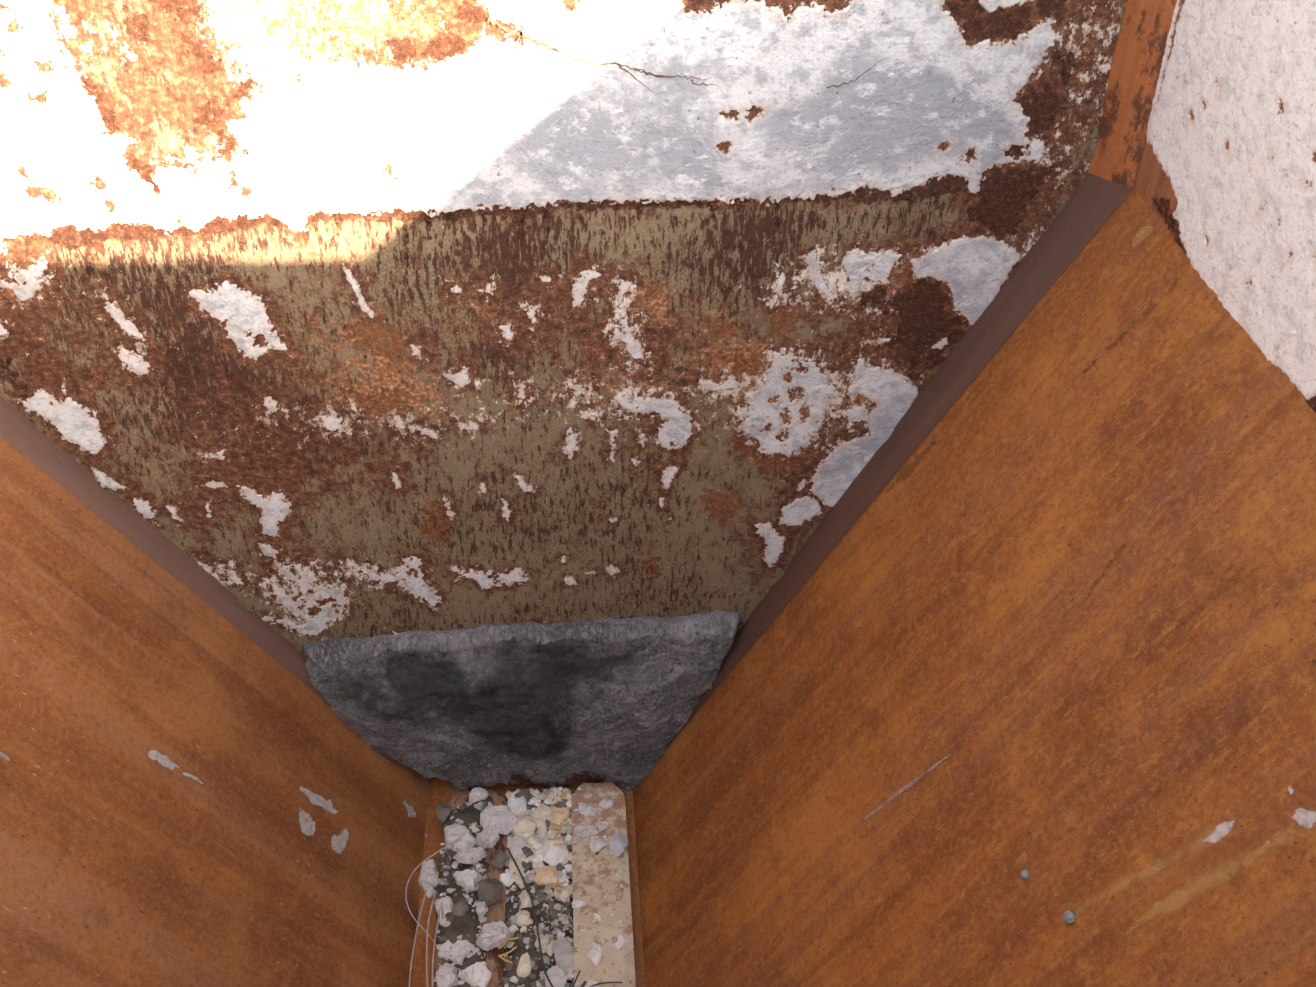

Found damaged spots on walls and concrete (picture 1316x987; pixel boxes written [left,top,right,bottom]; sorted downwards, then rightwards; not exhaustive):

peeling [0,0,1061,252]
corrosion [305,43,1079,267]
corrosion [0,359,37,399]
corrosion [23,213,283,278]
peeling [184,280,288,360]
corrosion [854,255,968,382]
peeling [804,235,1035,326]
corrosion [1153,198,1190,259]
peeling [17,382,183,523]
peeling [699,347,918,568]
peeling [196,481,353,636]
water stain [340,637,629,762]